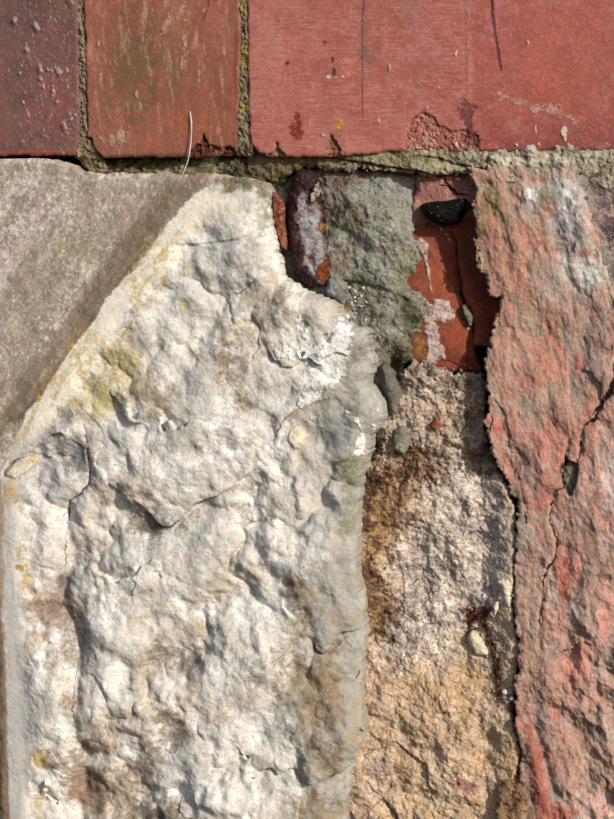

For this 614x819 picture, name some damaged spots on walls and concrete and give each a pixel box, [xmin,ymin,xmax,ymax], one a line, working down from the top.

spalling [405,112,479,149]
rust [308,254,331,283]
spalling [407,173,502,373]
crack [62,450,91,569]
crack [415,512,497,567]
crack [538,364,614,647]
crack [391,552,447,672]
rust [462,598,520,747]
crack [362,740,431,819]
rust [510,770,522,812]